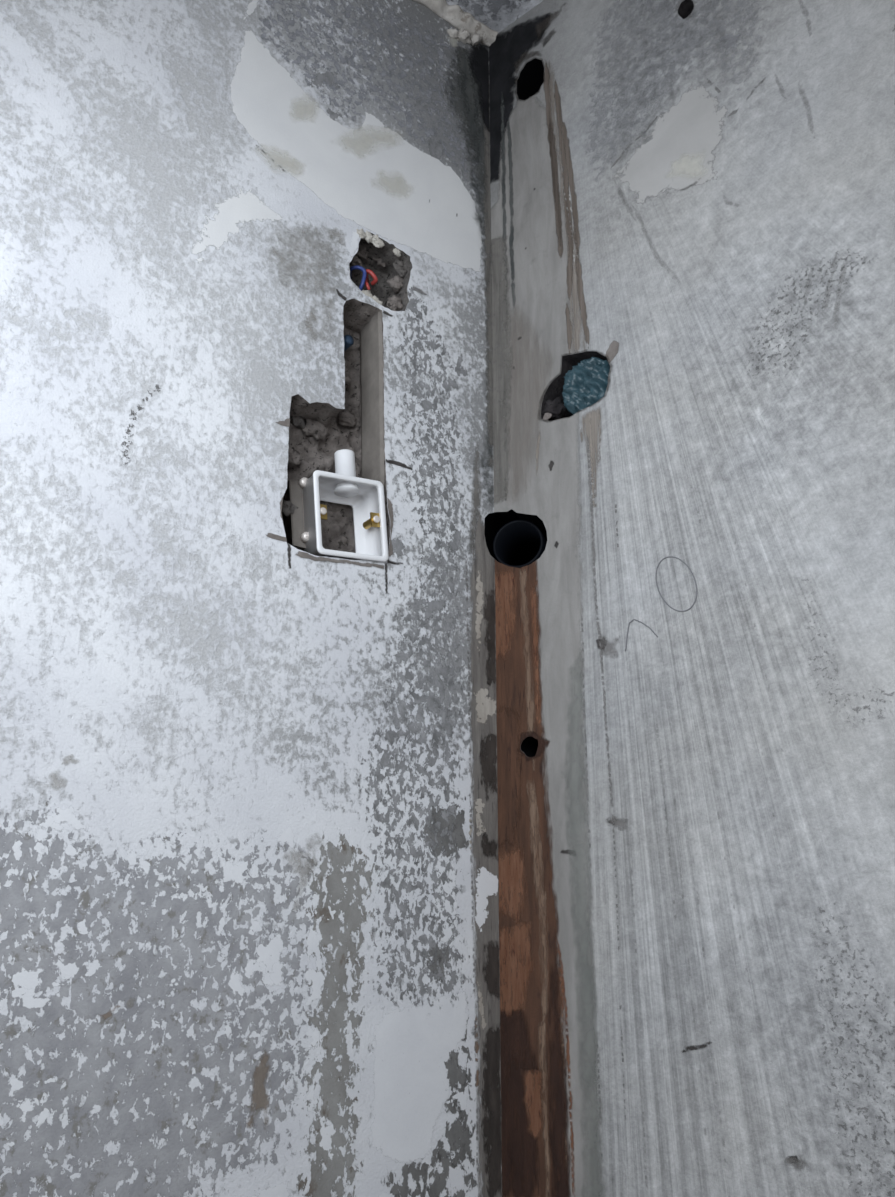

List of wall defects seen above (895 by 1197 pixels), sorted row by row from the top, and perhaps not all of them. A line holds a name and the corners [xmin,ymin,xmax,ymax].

peeling [259,0,483,198]
peeling [0,229,498,1197]
corrosion [495,560,575,1197]